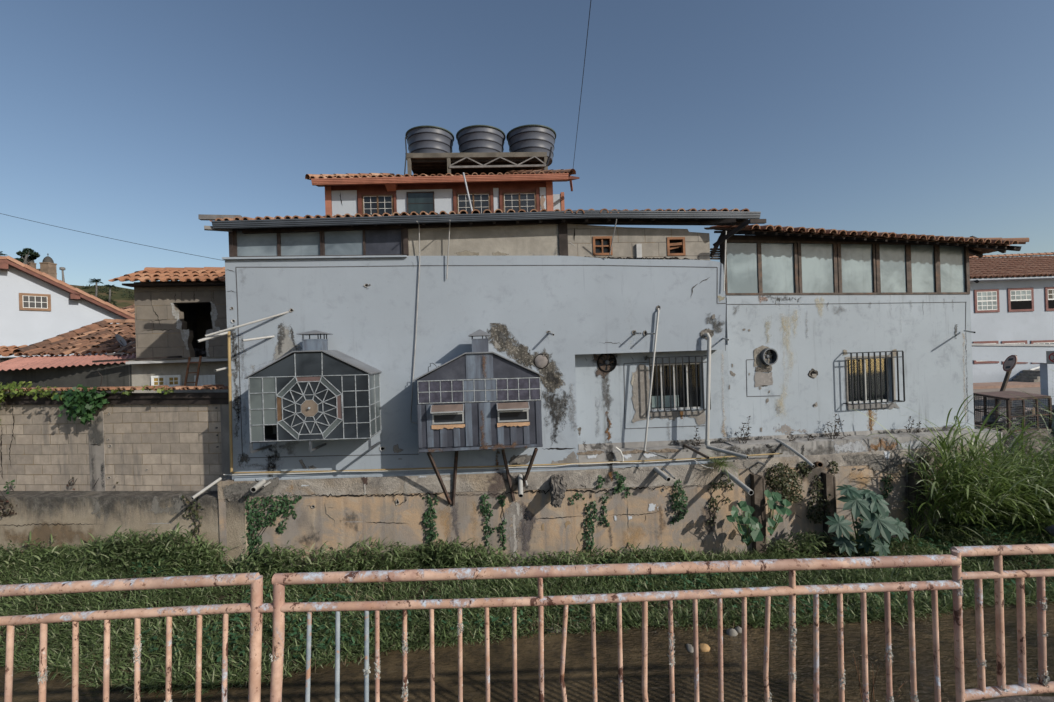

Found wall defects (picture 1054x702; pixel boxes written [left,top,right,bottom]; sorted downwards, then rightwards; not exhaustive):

crack [570,228,708,293]
spalling [170,303,189,350]
peeling [631,364,706,425]
damp [502,463,536,559]